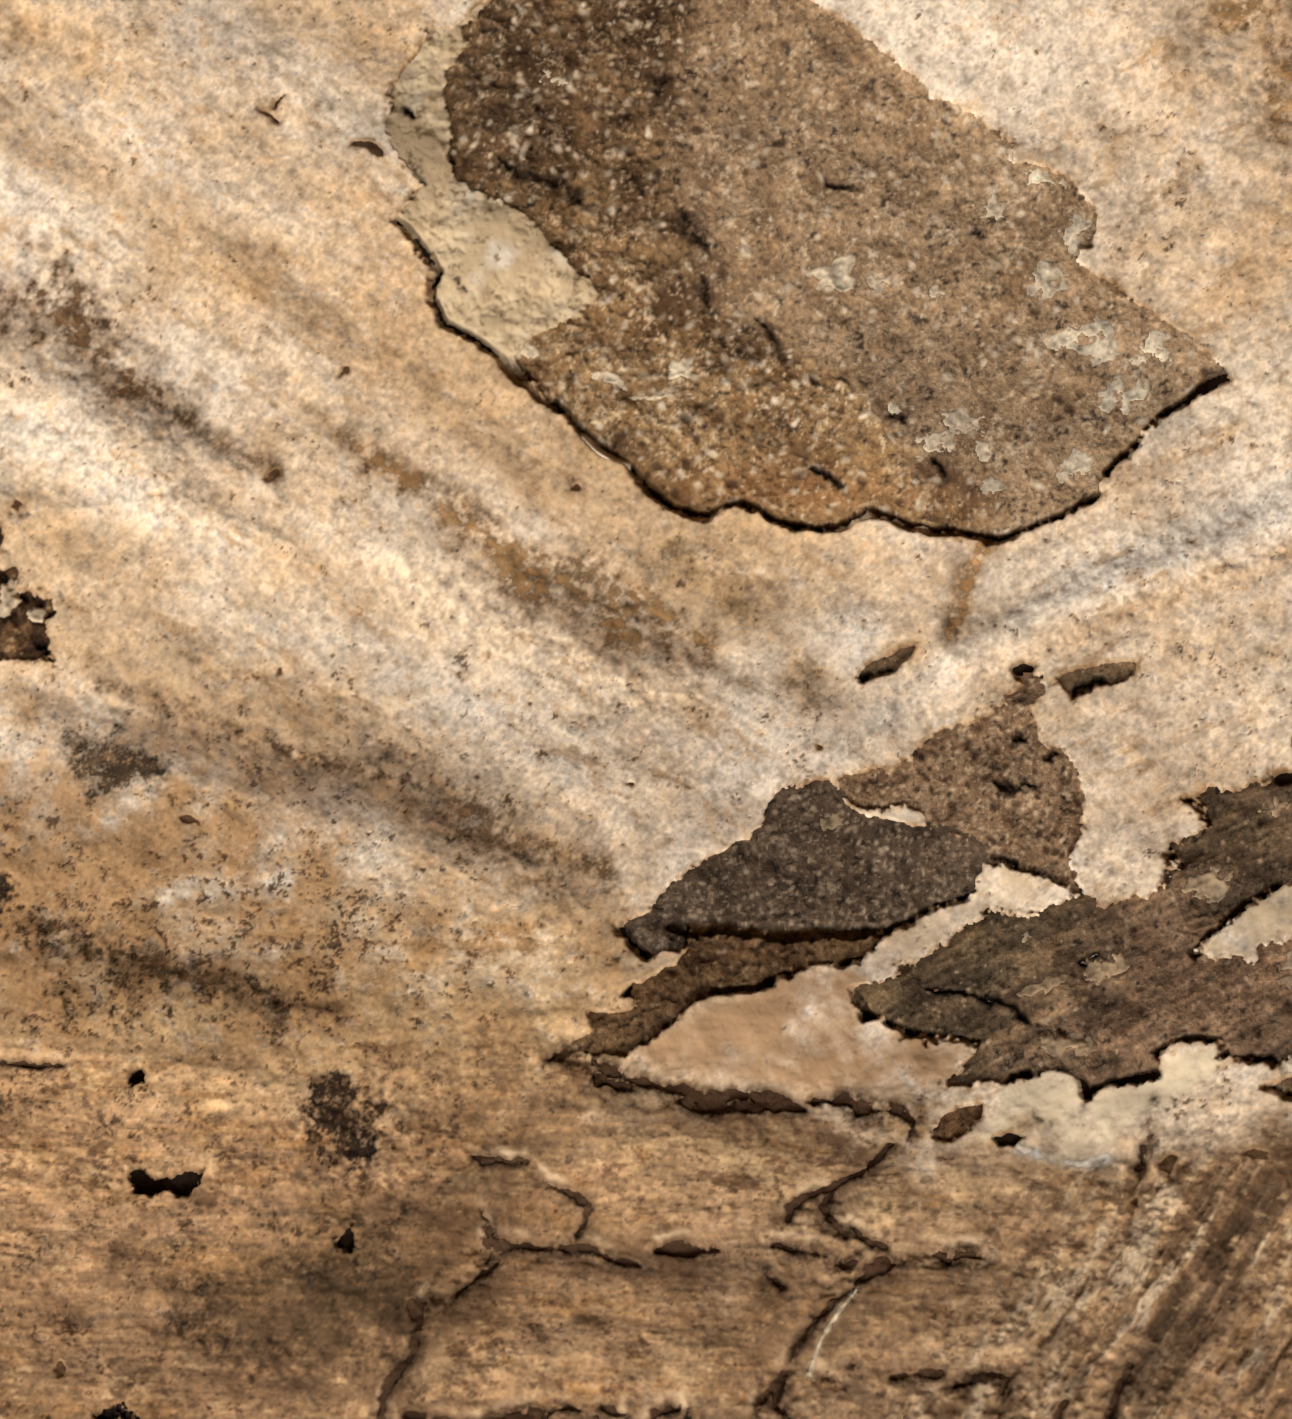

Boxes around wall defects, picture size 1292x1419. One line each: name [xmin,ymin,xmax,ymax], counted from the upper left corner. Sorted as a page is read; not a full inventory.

spalling [386,0,1228,539]
spalling [0,567,56,662]
peeling [553,662,1292,1100]
spalling [933,1104,983,1142]
crack [1134,1145,1148,1173]
crack [376,1052,1015,1419]
spalling [94,1402,140,1419]
crack [1054,1399,1069,1419]
crack [1105,1362,1135,1419]